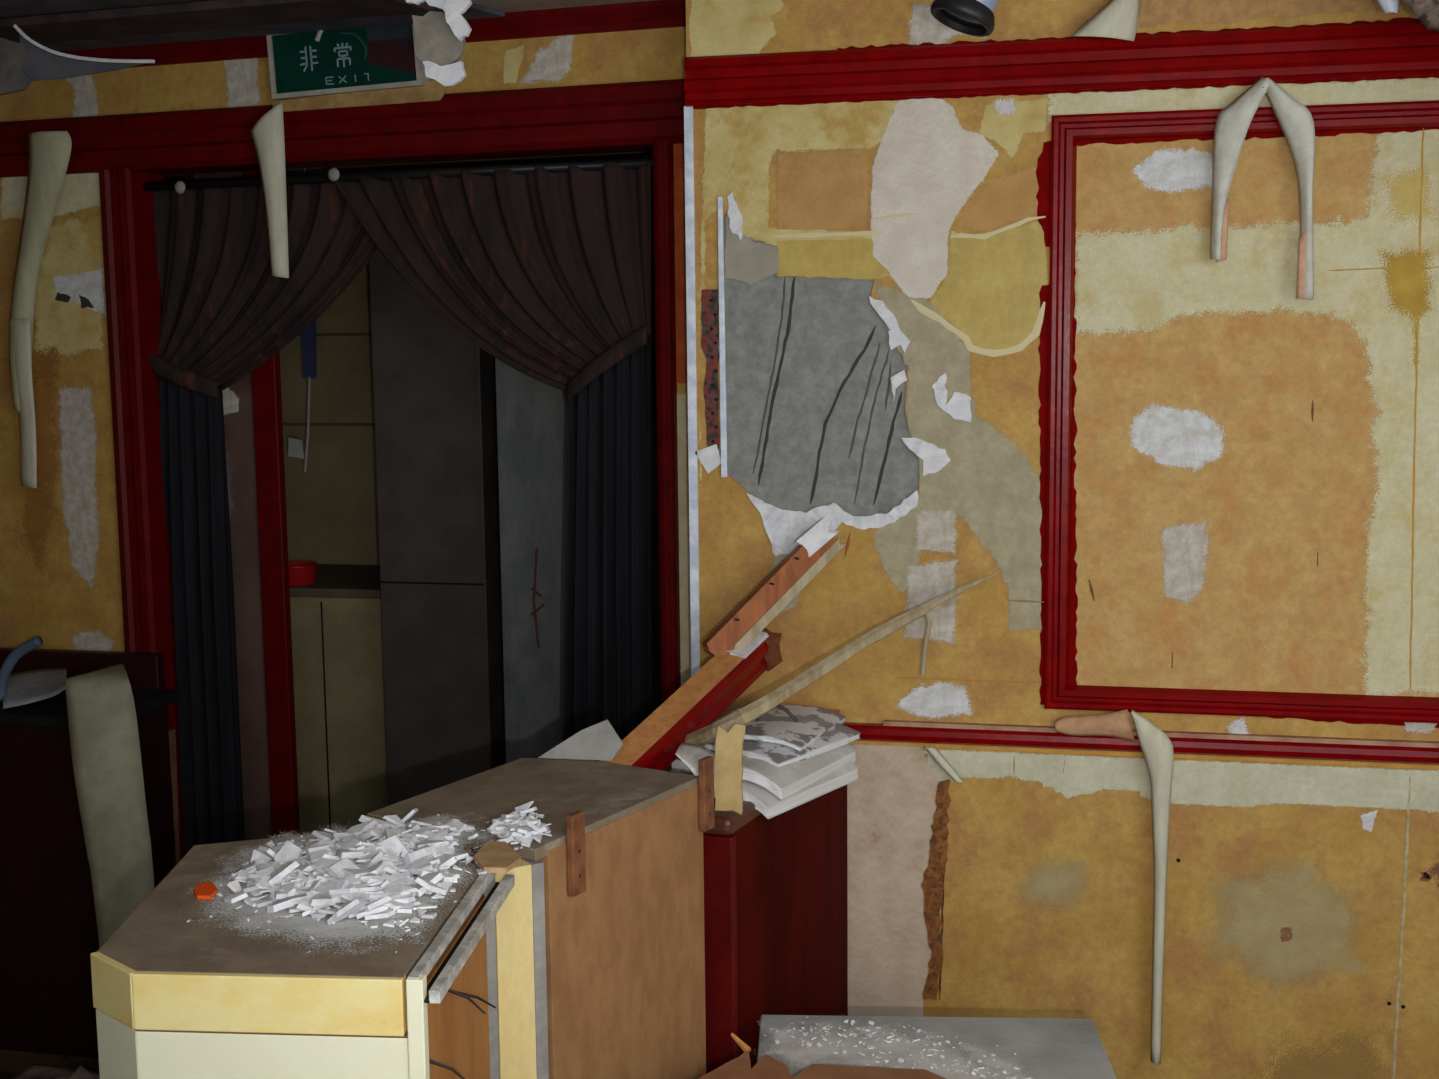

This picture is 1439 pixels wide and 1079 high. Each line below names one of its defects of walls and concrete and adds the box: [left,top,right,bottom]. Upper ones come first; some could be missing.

spalling [696,98,1042,632]
water stain [1367,162,1439,366]
flaking render [847,744,939,1017]
water stain [1187,840,1379,1002]